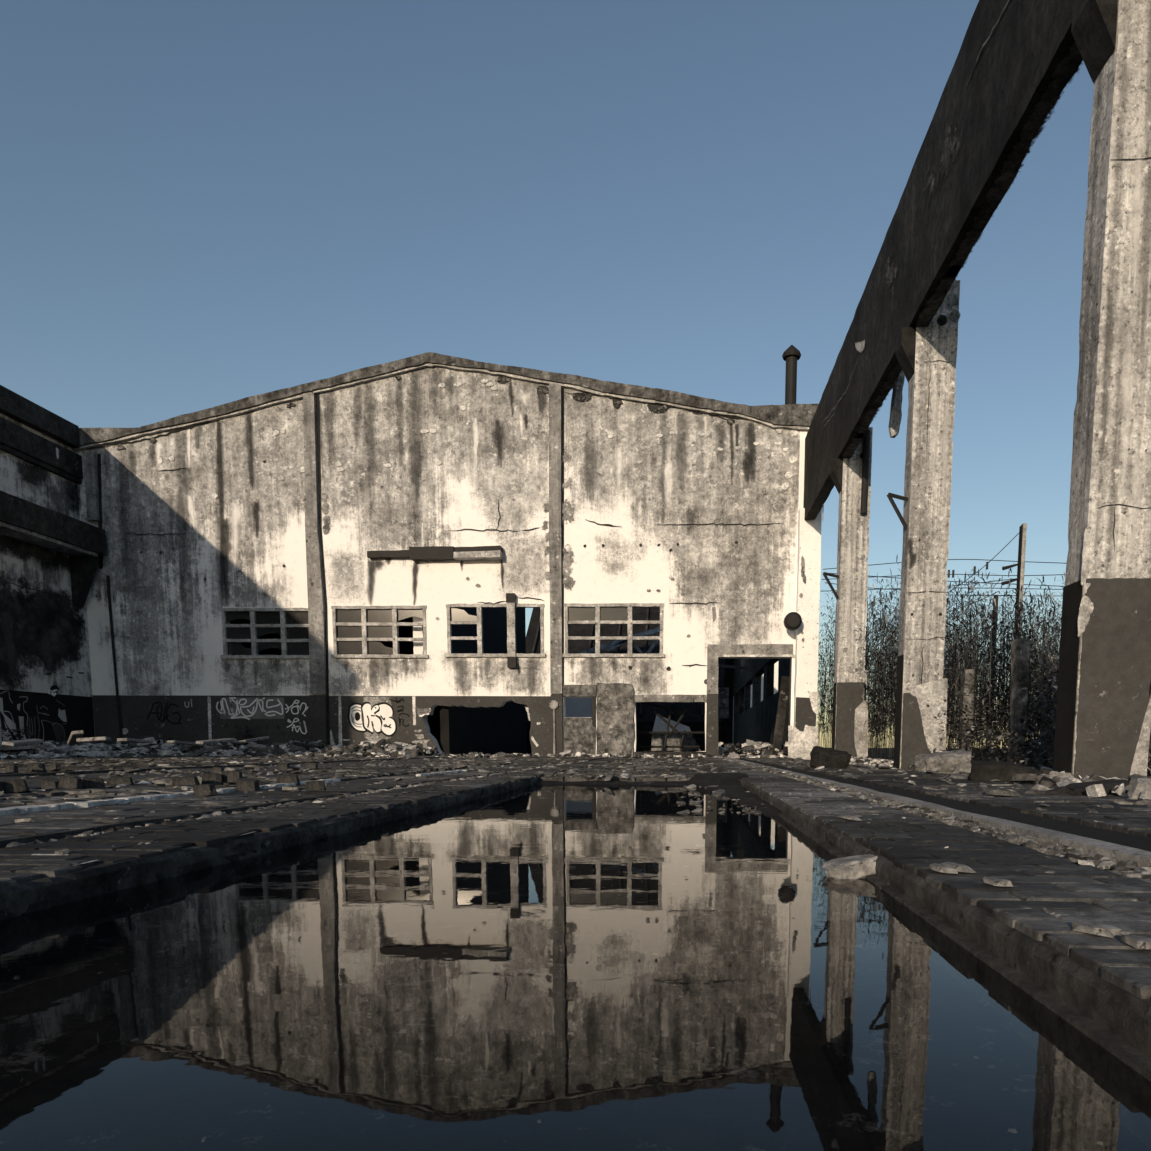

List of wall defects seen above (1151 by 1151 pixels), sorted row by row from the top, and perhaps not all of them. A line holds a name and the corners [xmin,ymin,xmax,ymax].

leakage [509,382,546,433]
leakage [17,460,50,491]
leakage [66,481,81,511]
leakage [217,413,259,602]
crack [449,502,540,531]
leakage [493,420,503,461]
leakage [730,423,762,482]
leakage [0,534,86,695]
flaking render [443,657,546,747]